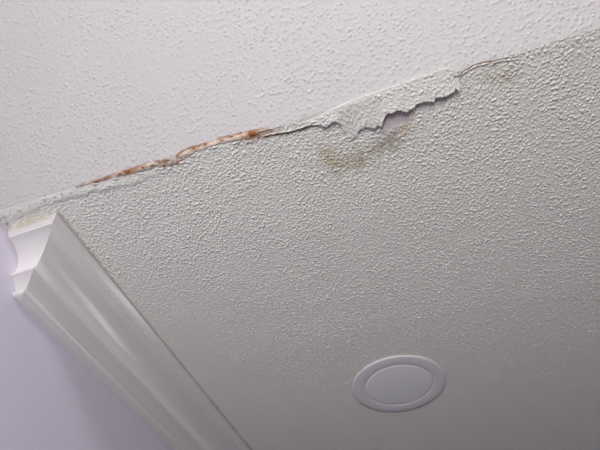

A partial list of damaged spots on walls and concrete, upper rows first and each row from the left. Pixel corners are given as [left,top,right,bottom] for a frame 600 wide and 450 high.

crack [450,57,516,78]
peeling [304,68,460,141]
crack [255,123,315,138]